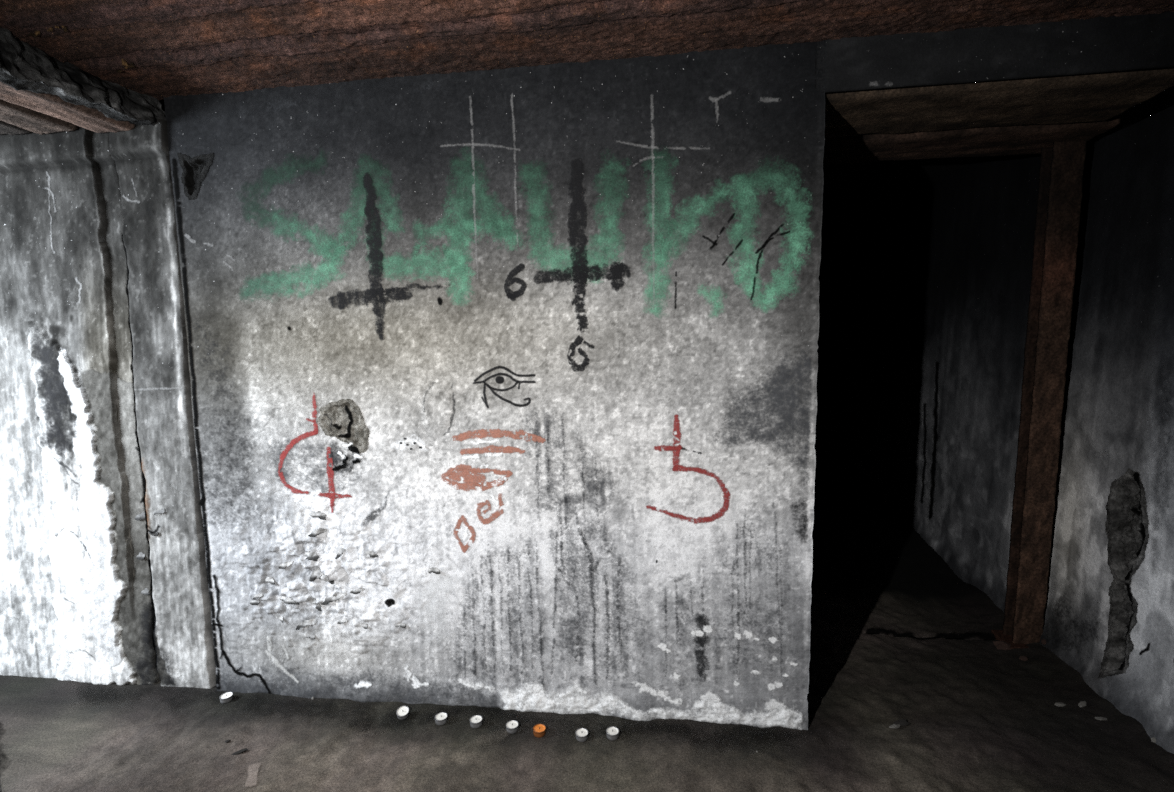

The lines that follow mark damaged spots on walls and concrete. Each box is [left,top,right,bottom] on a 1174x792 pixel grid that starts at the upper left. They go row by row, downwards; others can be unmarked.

flaking render [58,350,175,685]
crack [122,235,160,667]
crack [172,159,271,694]
leakage [237,669,372,716]
spalling [317,399,370,471]
leakage [532,421,627,666]
leakage [397,602,803,741]
spalling [1098,468,1149,679]